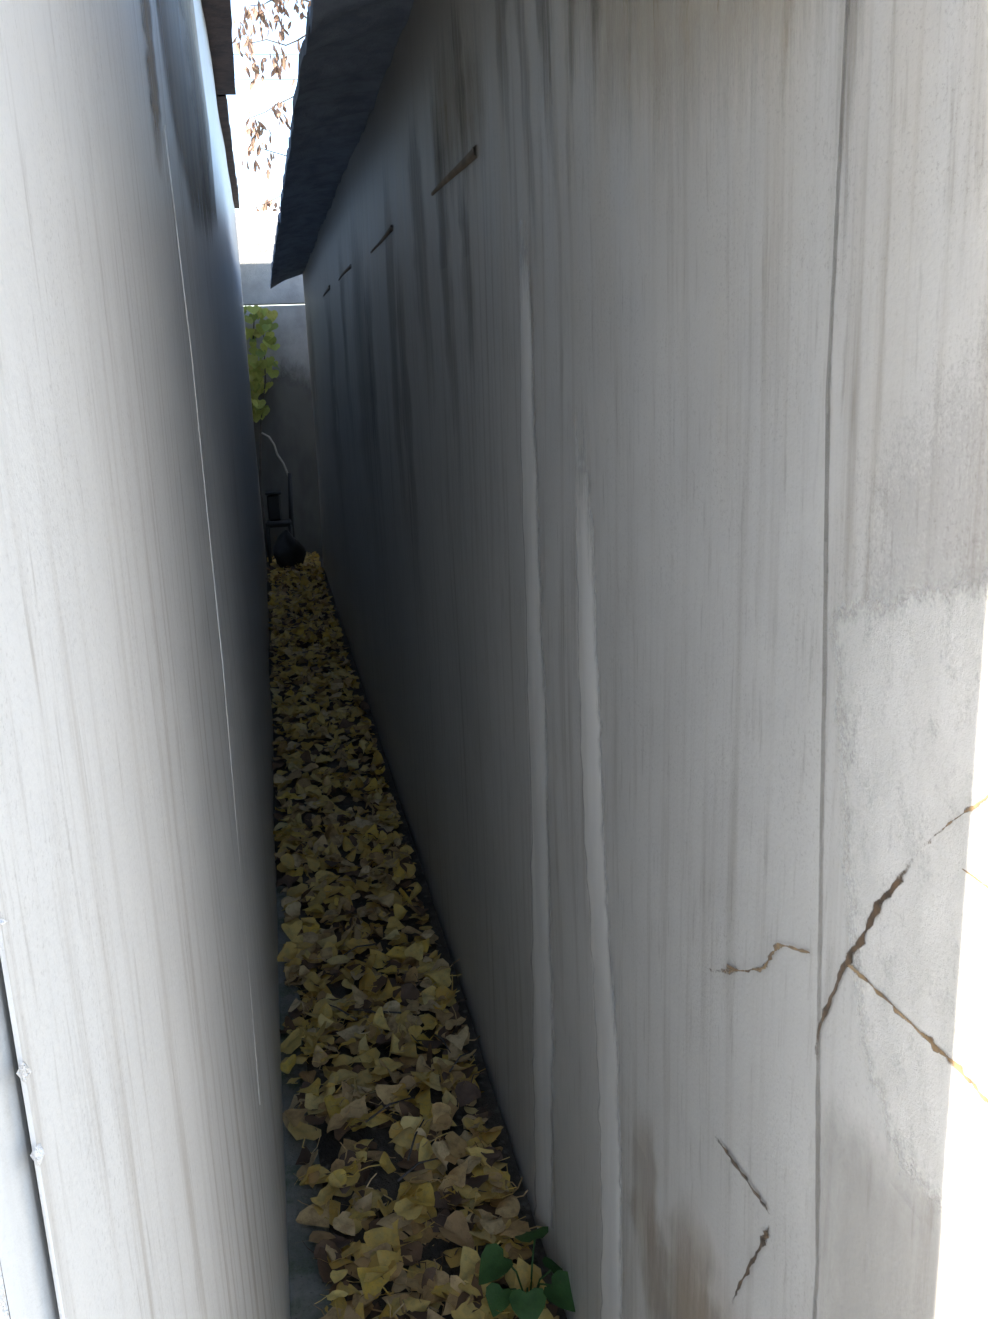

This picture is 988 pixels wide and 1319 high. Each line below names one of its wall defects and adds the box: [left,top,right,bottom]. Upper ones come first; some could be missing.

crack [928,789,988,843]
crack [710,943,810,975]
crack [815,869,988,1104]
crack [718,1140,769,1297]